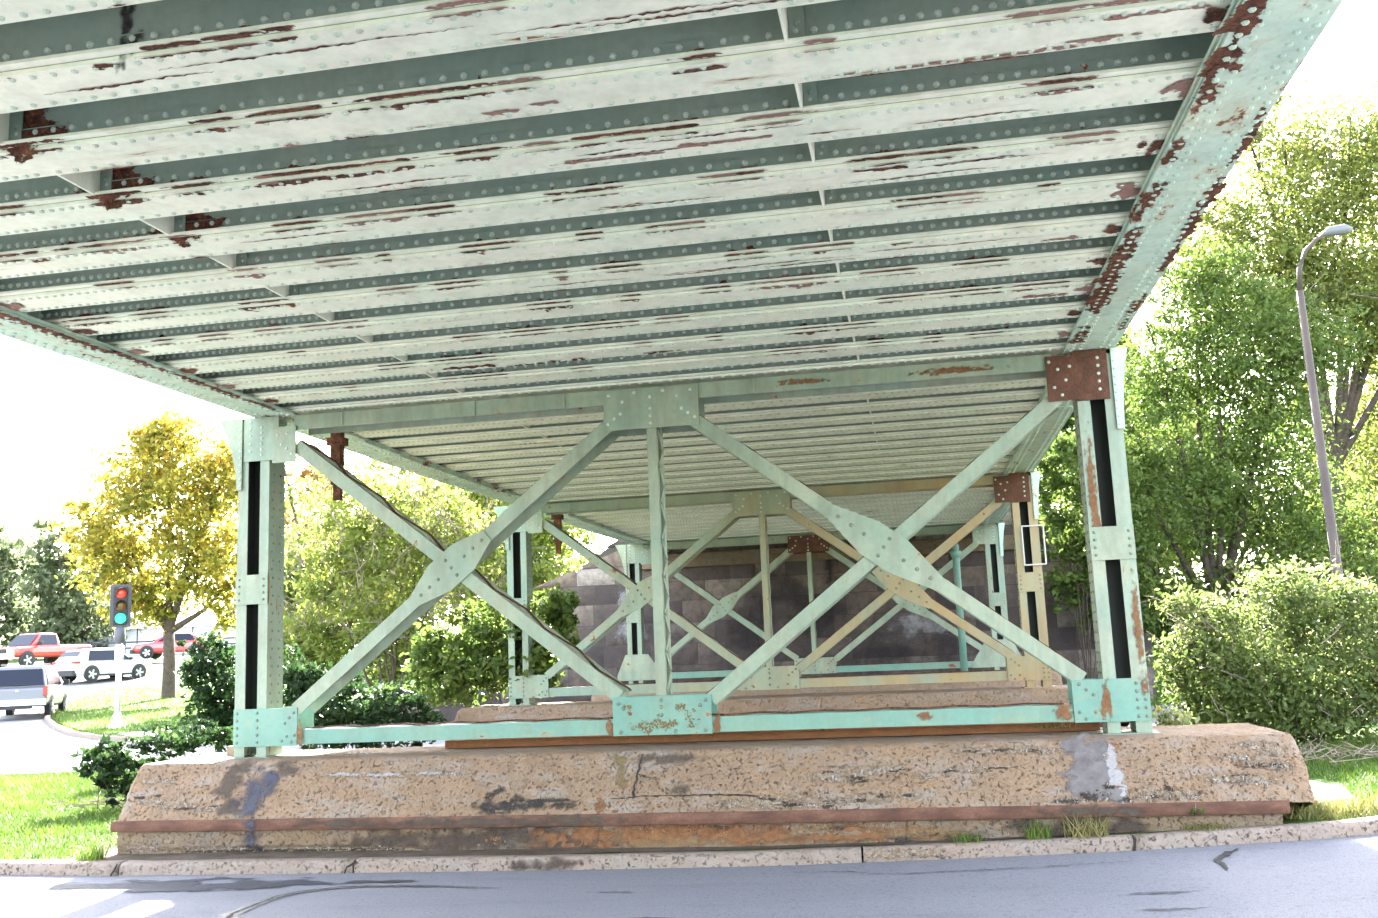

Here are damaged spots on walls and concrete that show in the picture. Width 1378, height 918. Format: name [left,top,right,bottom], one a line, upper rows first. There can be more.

corrosion [0,0,559,164]
corrosion [490,0,788,35]
corrosion [919,71,1097,124]
corrosion [829,0,1268,105]
corrosion [0,213,226,263]
corrosion [74,105,854,267]
corrosion [664,182,1168,344]
corrosion [843,127,1185,184]
corrosion [1156,106,1267,273]
corrosion [0,303,281,412]
water stain [213,759,298,852]
water stain [300,787,625,870]